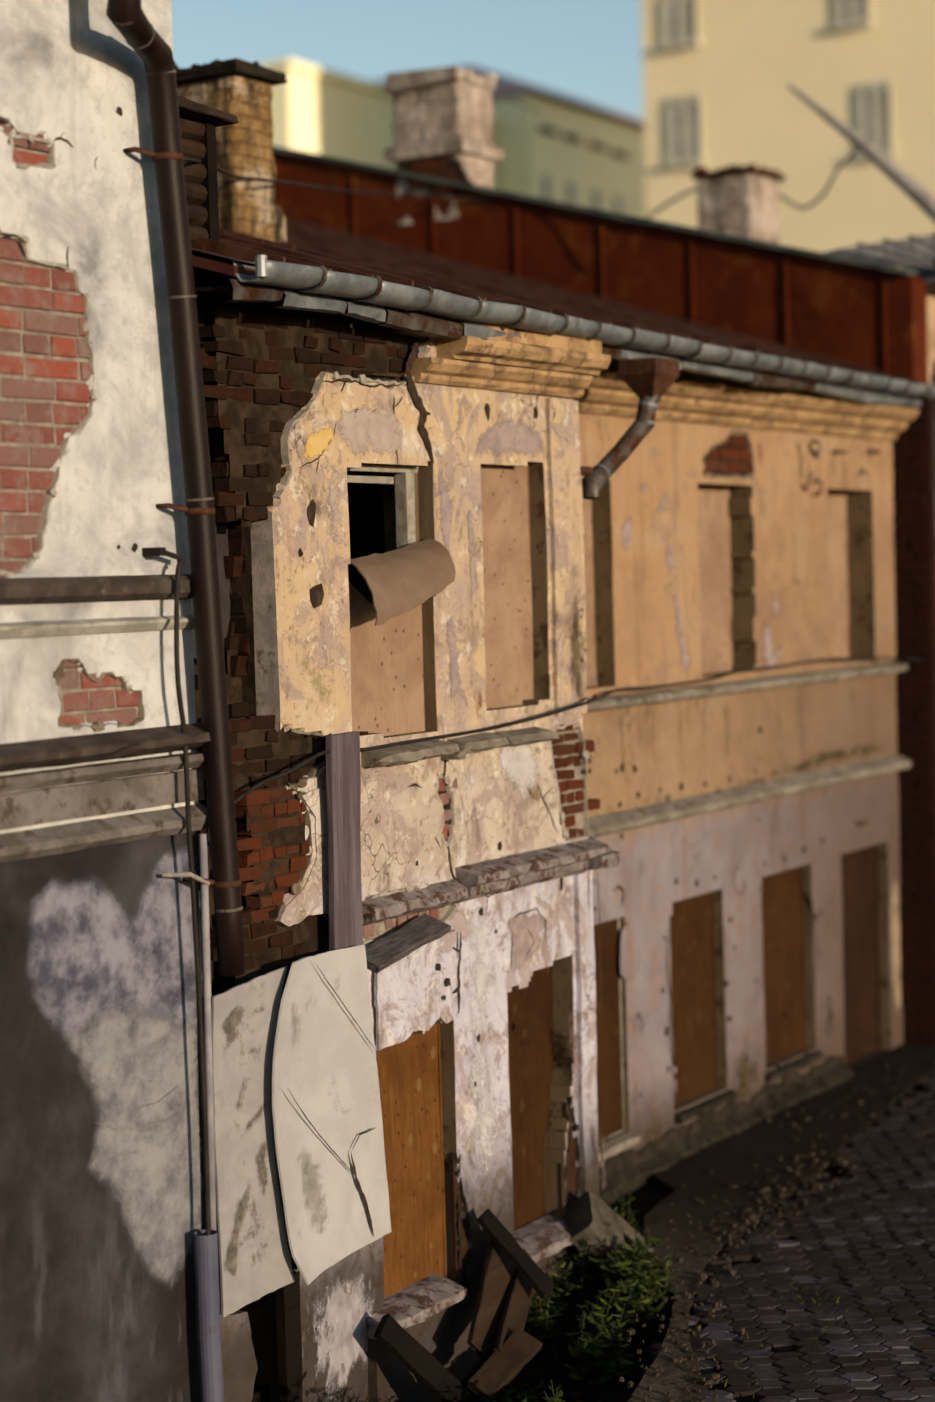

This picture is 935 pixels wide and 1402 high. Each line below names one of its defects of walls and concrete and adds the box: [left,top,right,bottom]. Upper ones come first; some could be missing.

spalling [0,116,56,169]
spalling [0,234,97,578]
crack [300,337,434,469]
spalling [698,430,755,487]
peeling [30,273,430,1310]
spalling [437,773,474,847]
spalling [499,720,601,842]
spalling [362,886,458,945]
peeling [495,914,542,969]
crack [286,1087,375,1236]